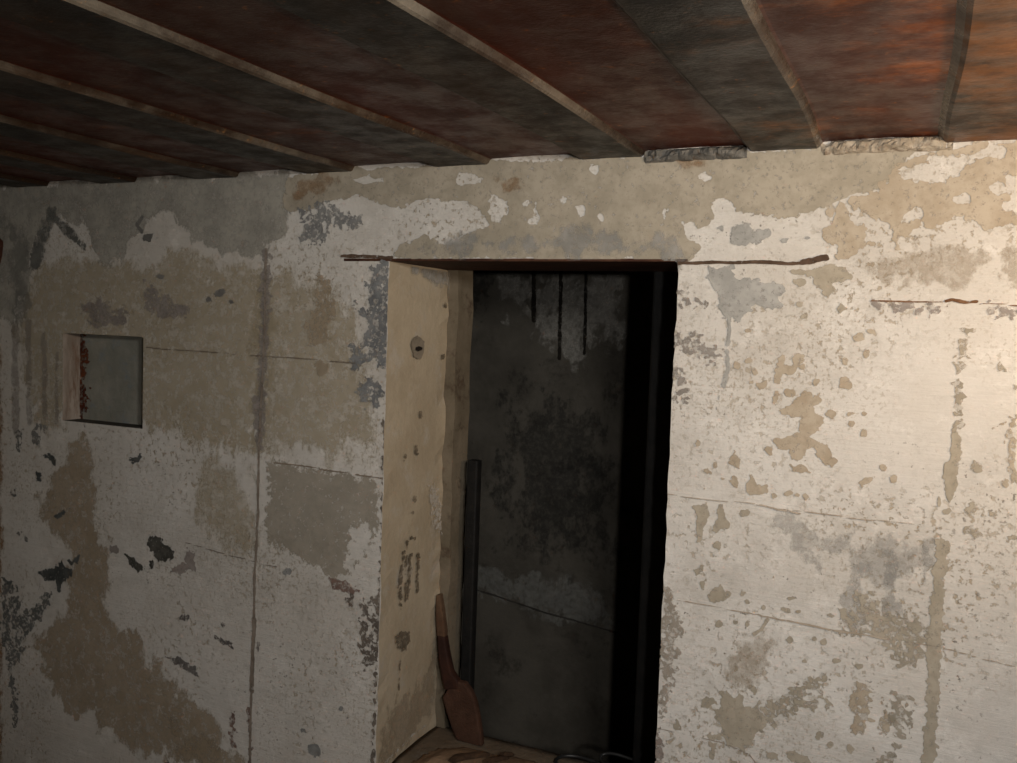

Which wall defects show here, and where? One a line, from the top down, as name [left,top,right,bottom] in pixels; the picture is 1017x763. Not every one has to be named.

crack [677,254,829,265]
corrosion [80,334,91,419]
leakage [0,169,373,461]
peeling [252,249,273,449]
peeling [264,136,1017,763]
spalling [38,554,80,593]
spalling [110,535,196,575]
peeling [165,656,198,677]